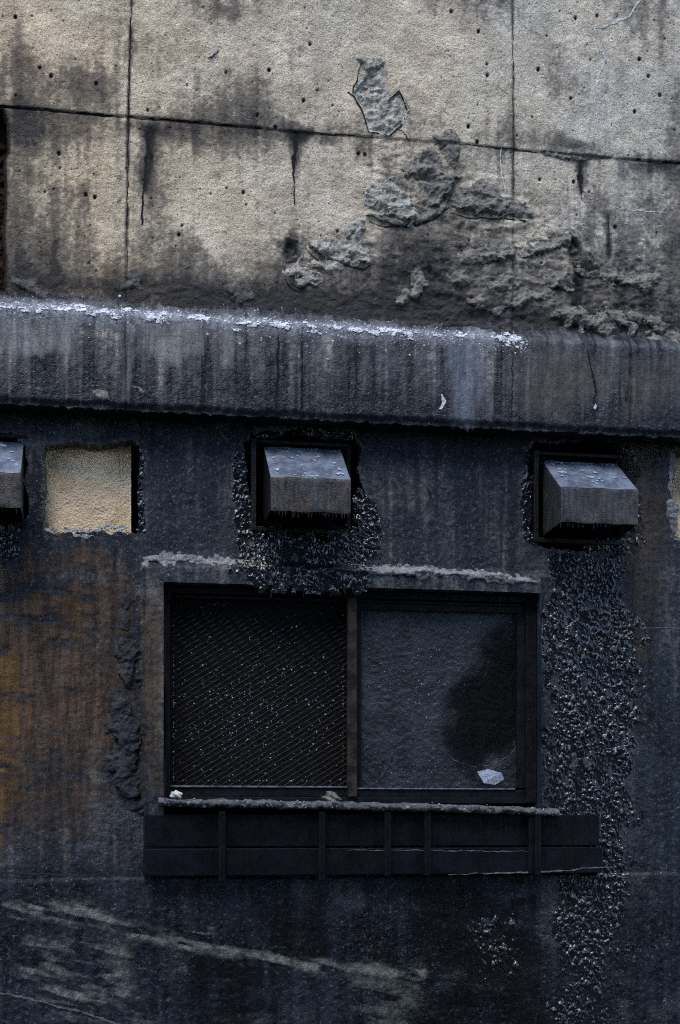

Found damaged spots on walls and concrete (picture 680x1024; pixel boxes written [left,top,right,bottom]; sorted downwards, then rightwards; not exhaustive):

spalling [348,55,410,142]
spalling [540,145,614,161]
peeling [0,108,528,371]
leakage [0,302,502,361]
crack [587,348,597,416]
spalling [44,524,128,538]